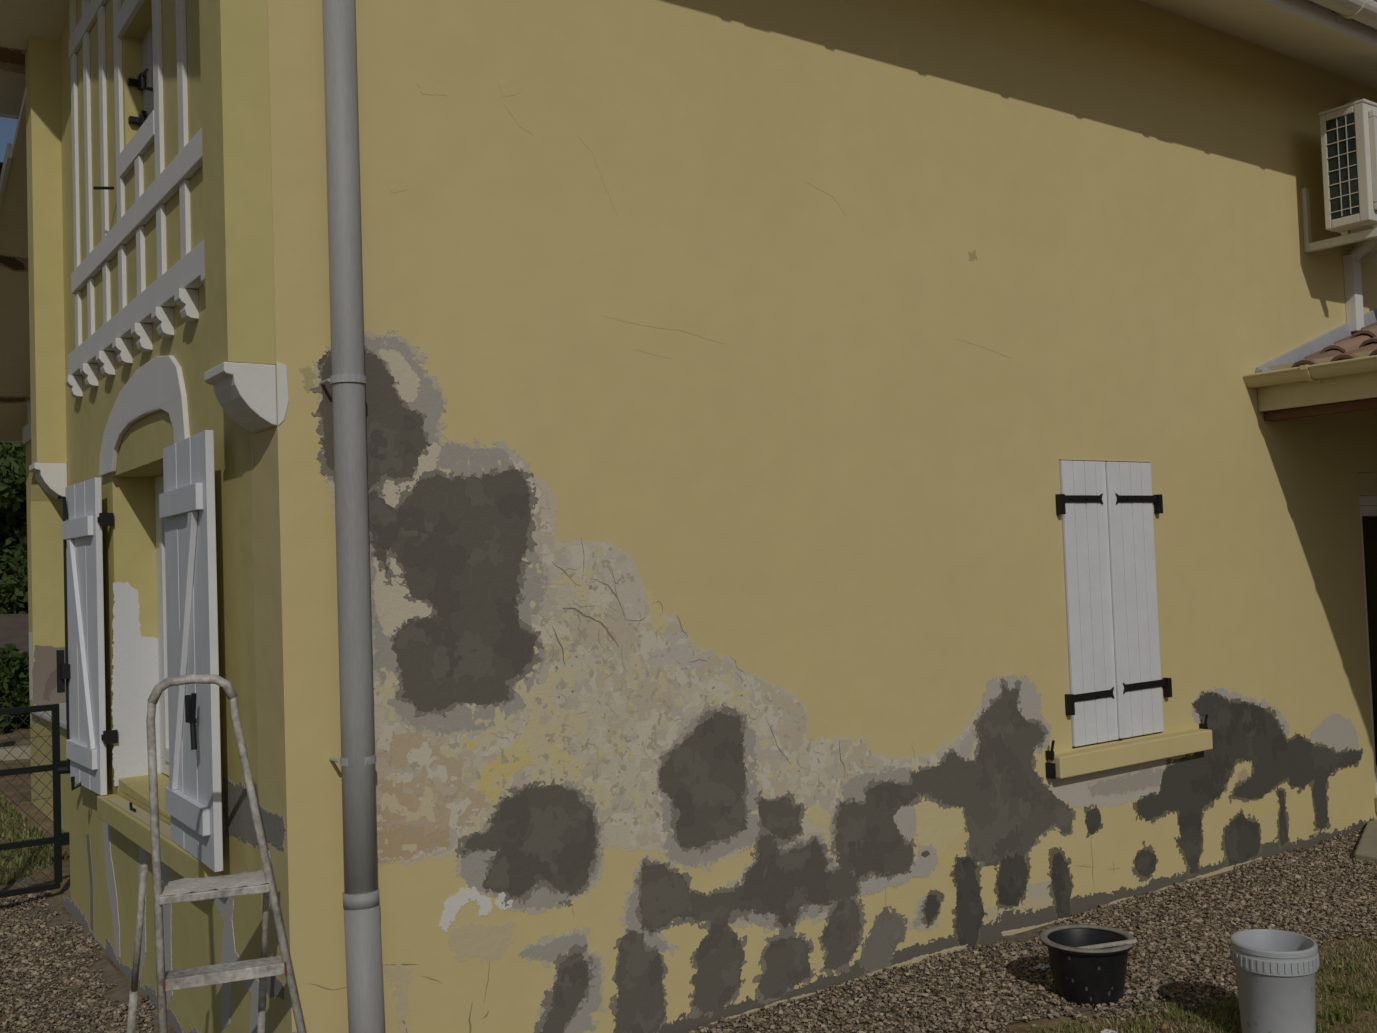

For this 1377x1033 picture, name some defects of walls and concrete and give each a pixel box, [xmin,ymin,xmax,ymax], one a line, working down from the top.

flaking render [378,348,421,403]
flaking render [378,442,441,508]
flaking render [372,557,432,637]
crack [540,537,742,780]
crack [749,715,850,777]
flaking render [1306,710,1359,753]
peeling [374,728,491,863]
flaking render [1048,756,1179,809]
flaking render [983,896,1053,924]
crack [468,962,490,1033]